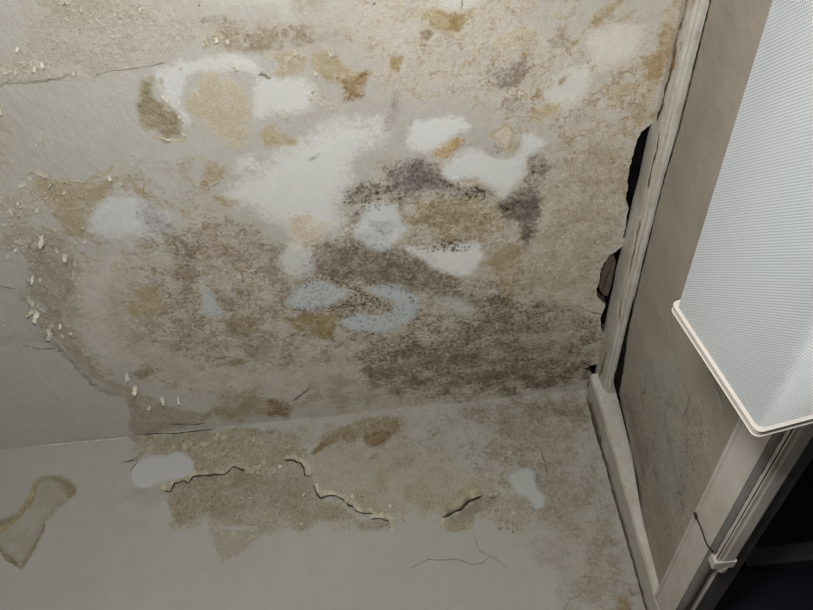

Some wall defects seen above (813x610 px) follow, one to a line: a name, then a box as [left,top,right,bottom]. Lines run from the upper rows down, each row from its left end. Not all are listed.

peeling [0,47,82,87]
water stain [222,28,312,50]
water stain [493,52,548,112]
water stain [641,25,676,121]
water stain [344,64,646,395]
spalling [596,124,660,333]
water stain [282,239,473,337]
peeling [0,164,395,543]
peeling [438,487,500,530]
peeling [510,469,543,508]
peeling [0,524,46,570]